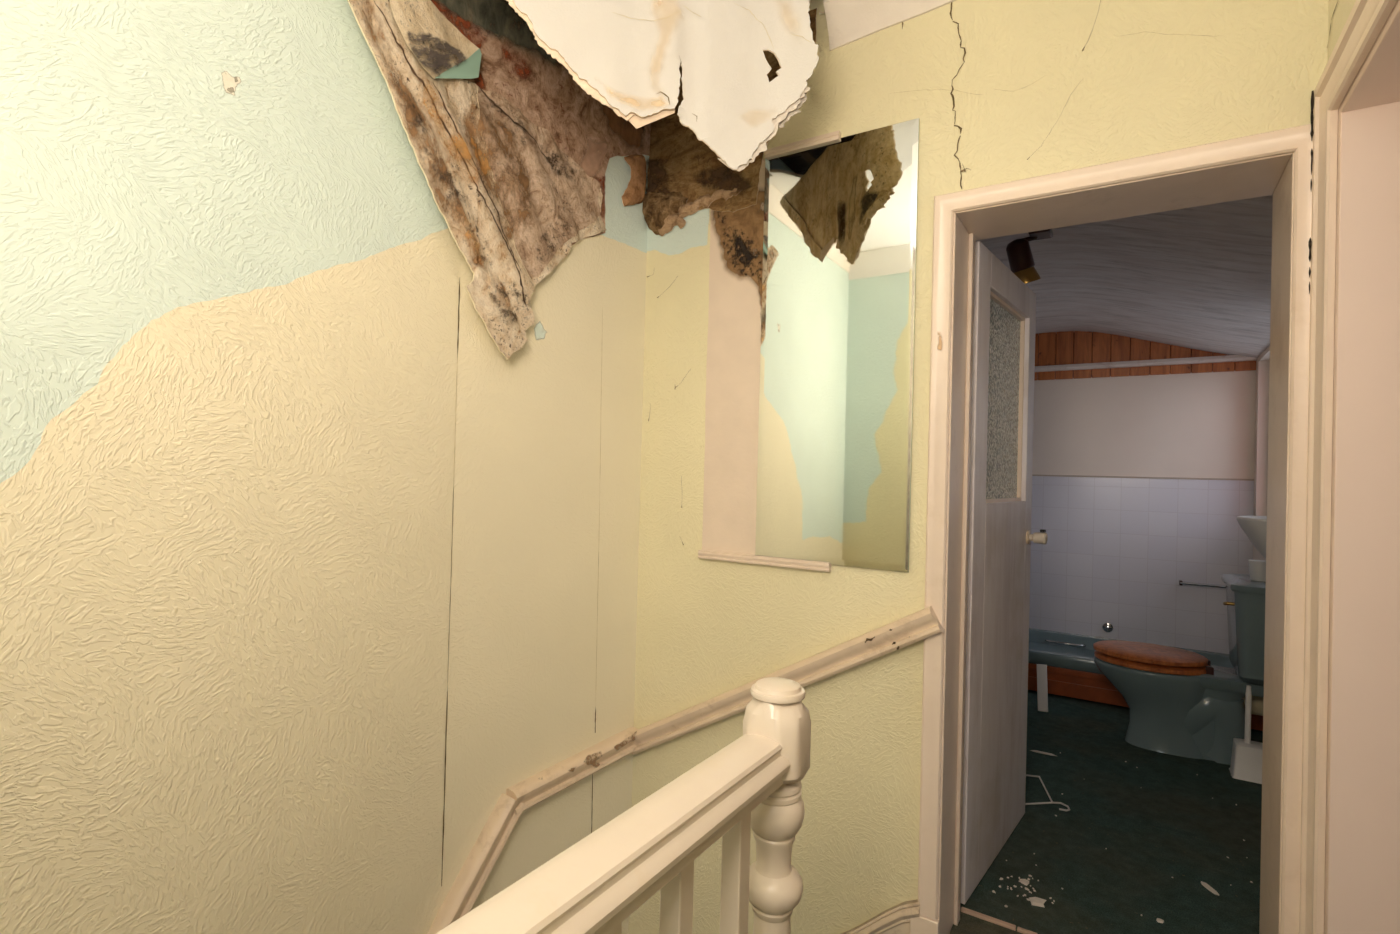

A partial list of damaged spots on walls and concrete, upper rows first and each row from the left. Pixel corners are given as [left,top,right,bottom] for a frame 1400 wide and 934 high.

water stain [362,0,386,42]
water stain [408,33,466,75]
water stain [436,0,557,65]
crack [896,2,1043,189]
water stain [384,59,575,267]
water stain [602,104,670,194]
water stain [696,166,765,306]
water stain [488,283,529,322]